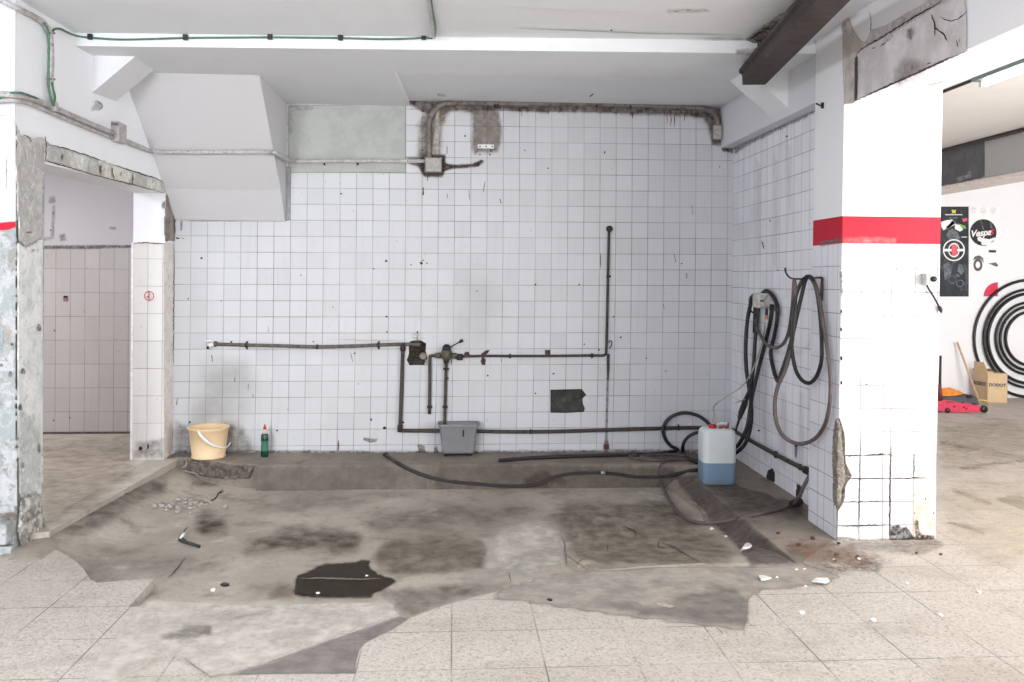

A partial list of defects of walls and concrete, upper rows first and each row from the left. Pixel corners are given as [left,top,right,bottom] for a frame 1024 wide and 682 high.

flaking render [843,0,967,104]
crack [857,0,967,100]
leakage [473,111,500,153]
peeling [0,124,176,547]
spalling [832,418,846,507]